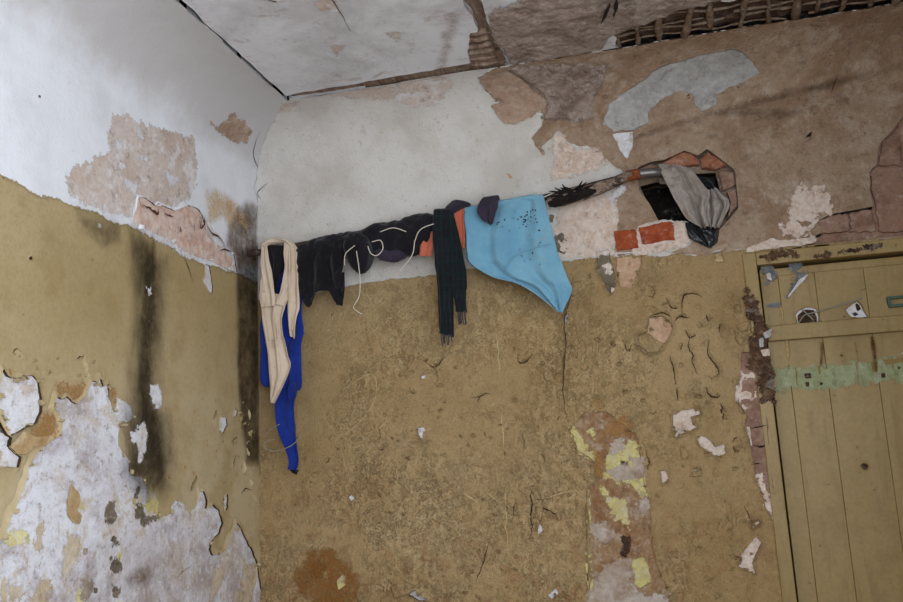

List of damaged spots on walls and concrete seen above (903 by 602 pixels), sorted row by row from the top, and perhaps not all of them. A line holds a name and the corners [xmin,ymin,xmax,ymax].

peeling [65,113,238,296]
spalling [475,0,903,317]
peeling [0,358,261,602]
water stain [150,419,164,466]
peeling [322,570,346,590]
peeling [565,394,673,602]
peeling [624,302,677,358]
peeling [670,394,738,488]
crack [647,286,767,464]
spalling [730,328,903,576]